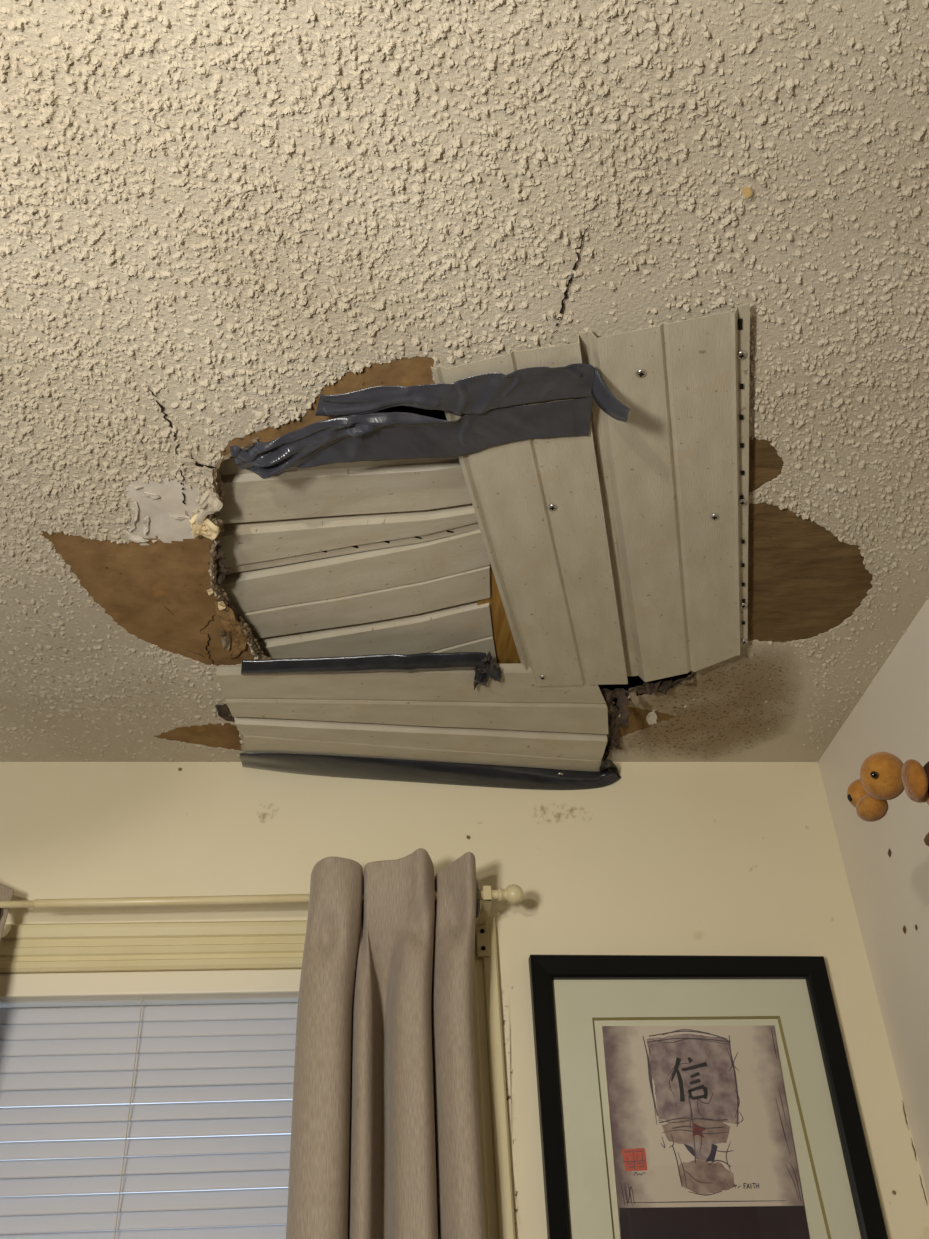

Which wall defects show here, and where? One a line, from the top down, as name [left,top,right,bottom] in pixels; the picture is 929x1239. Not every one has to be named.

crack [550,223,590,345]
peeling [42,356,435,666]
peeling [748,437,873,643]
peeling [154,704,243,751]
peeling [618,706,675,739]